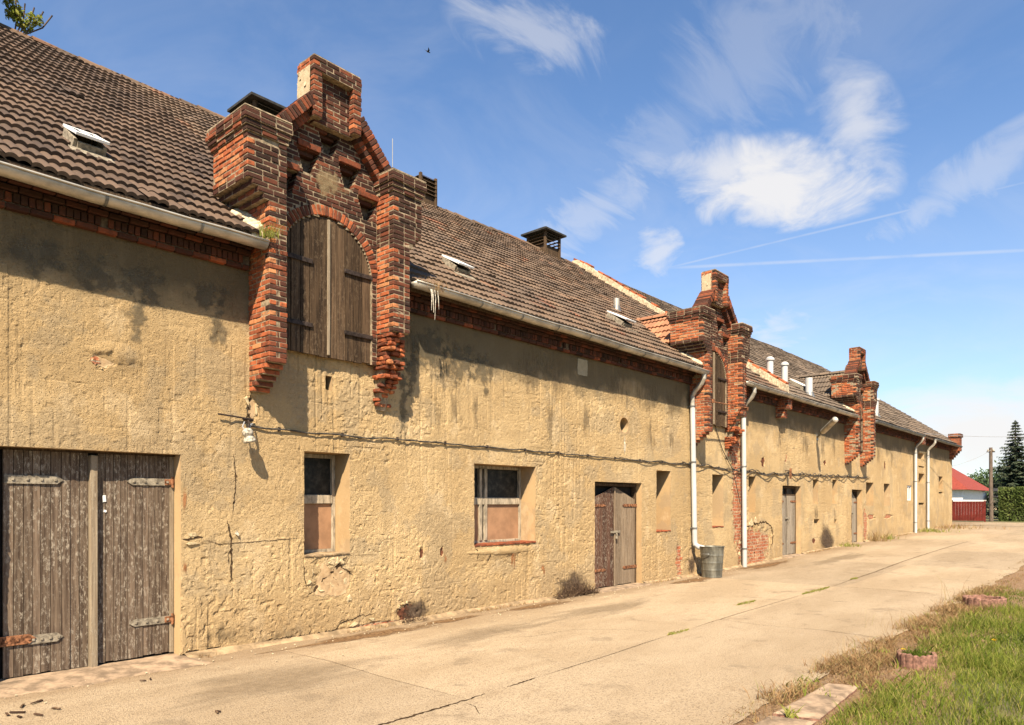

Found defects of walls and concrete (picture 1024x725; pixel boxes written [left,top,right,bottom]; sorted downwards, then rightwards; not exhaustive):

leakage [195,285,230,342]
flaking render [90,354,114,369]
crack [183,454,298,581]
flaking render [731,434,771,565]
flaking render [307,557,352,602]